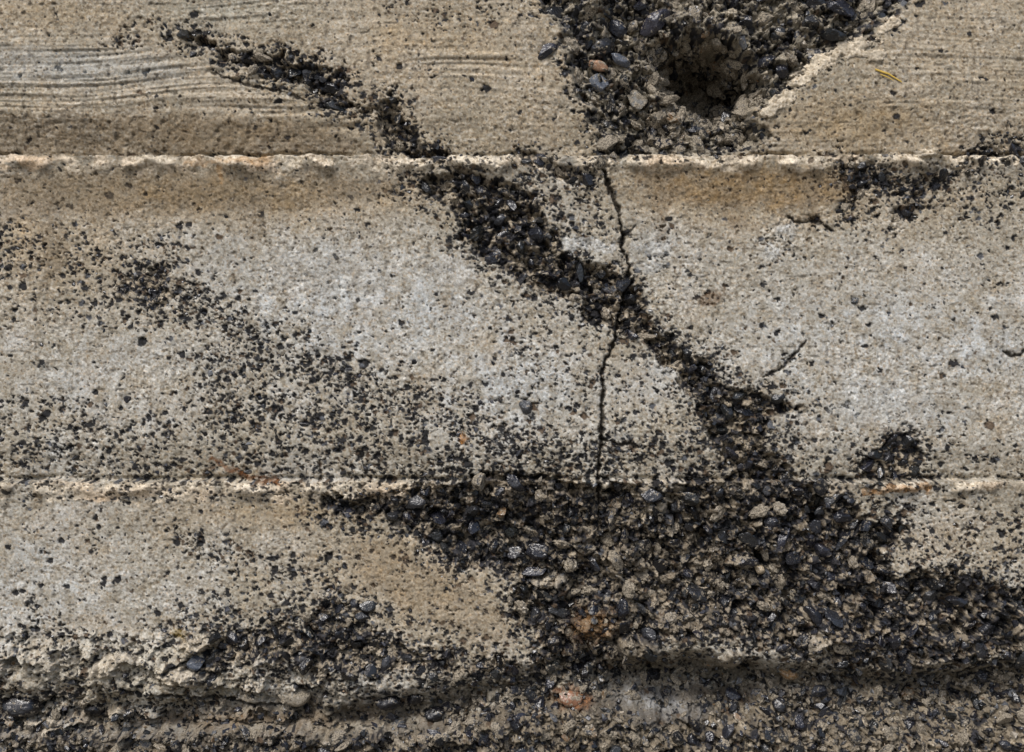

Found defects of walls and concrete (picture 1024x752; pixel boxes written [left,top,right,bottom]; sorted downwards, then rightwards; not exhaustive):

spalling [518,0,913,191]
spalling [116,260,190,308]
spalling [176,29,807,478]
crack [595,169,641,517]
spalling [0,465,1024,752]